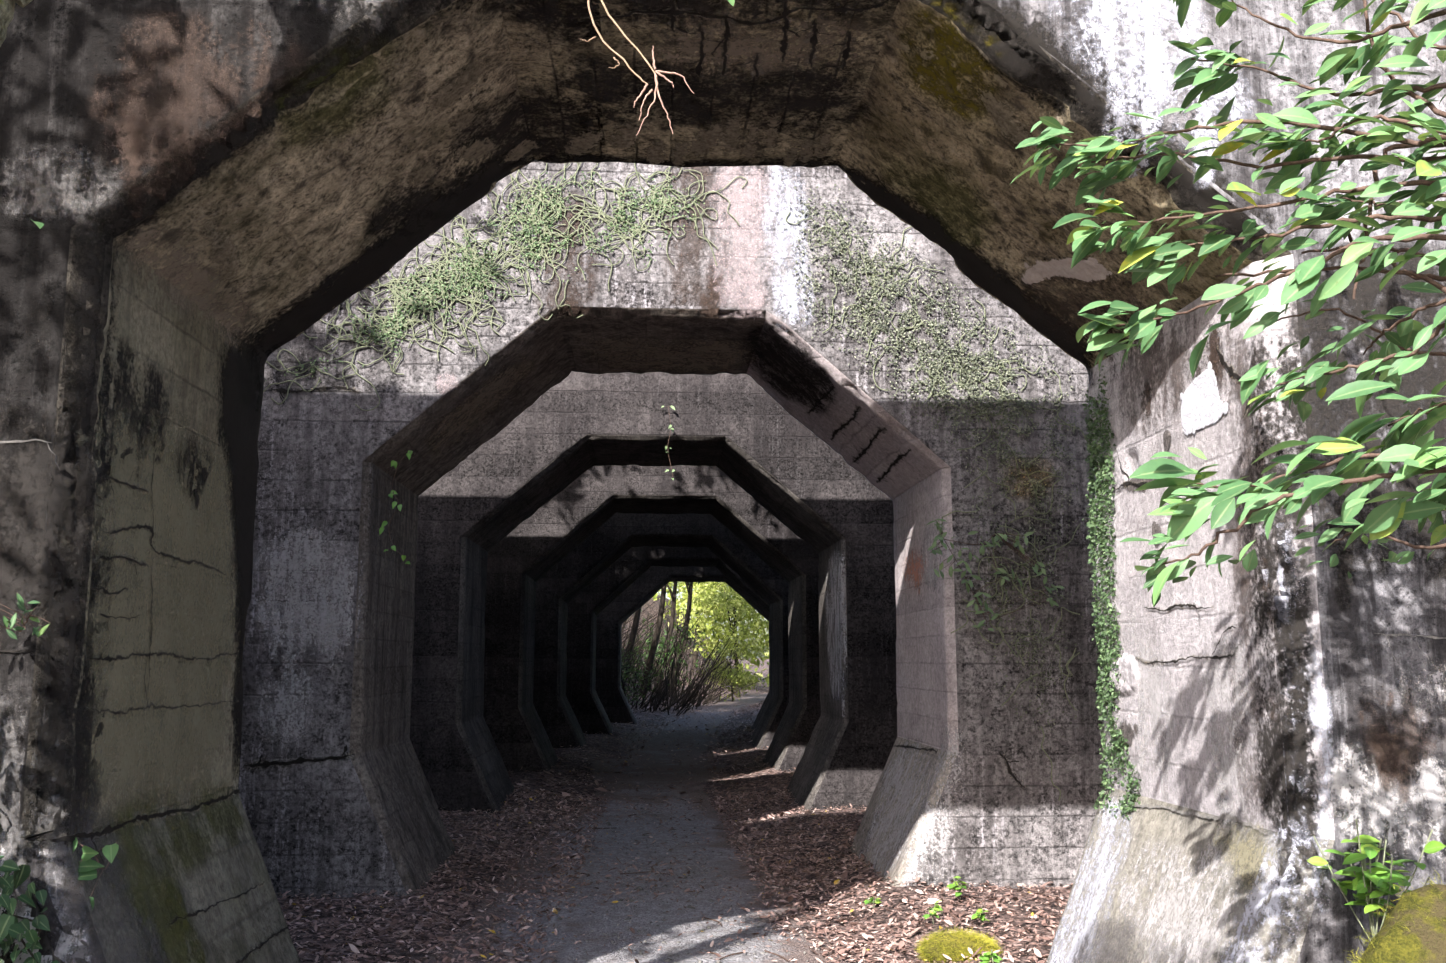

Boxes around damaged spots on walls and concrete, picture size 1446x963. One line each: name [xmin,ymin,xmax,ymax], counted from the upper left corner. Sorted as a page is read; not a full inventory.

crack [807,386,911,483]
spalling [1127,465,1156,493]
peeling [1163,361,1228,460]
crack [75,453,241,730]
crack [1135,603,1239,665]
damp [1048,242,1446,963]
crack [26,745,355,864]
crack [167,882,264,940]
crack [236,927,288,963]